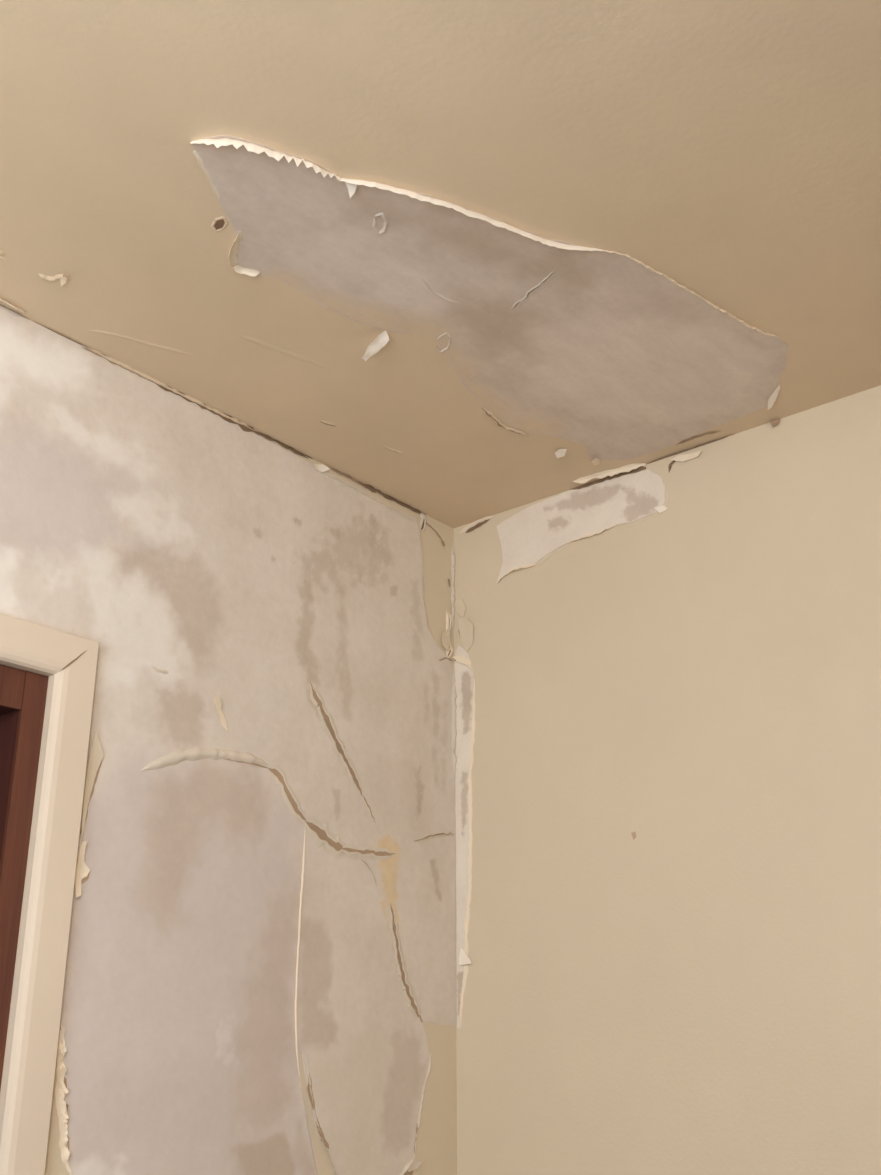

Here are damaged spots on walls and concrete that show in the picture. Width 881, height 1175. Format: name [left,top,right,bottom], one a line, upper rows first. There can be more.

peeling [190,135,789,583]
water stain [0,409,343,1175]
crack [140,680,454,1023]
water stain [270,498,473,903]
water stain [381,1021,429,1160]